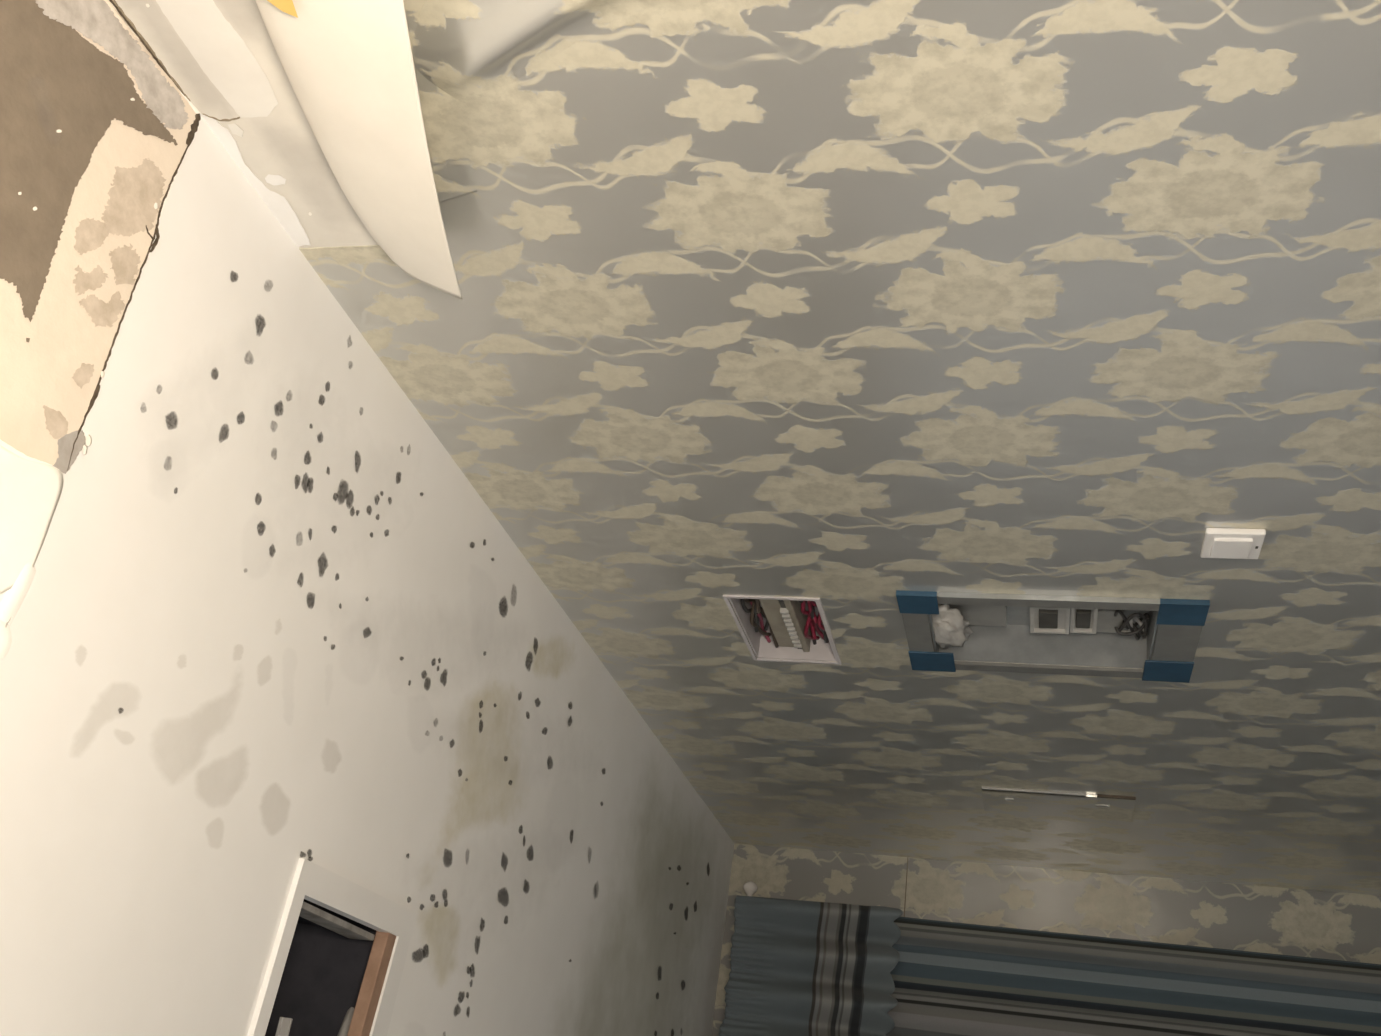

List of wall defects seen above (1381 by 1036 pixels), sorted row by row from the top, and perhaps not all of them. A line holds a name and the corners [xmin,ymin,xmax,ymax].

peeling [0,0,196,594]
damp [256,316,265,334]
damp [144,412,194,506]
damp [219,412,245,442]
damp [295,424,401,537]
damp [238,494,278,581]
damp [298,554,339,607]
damp [324,597,382,706]
damp [67,618,299,850]
damp [402,540,734,1036]